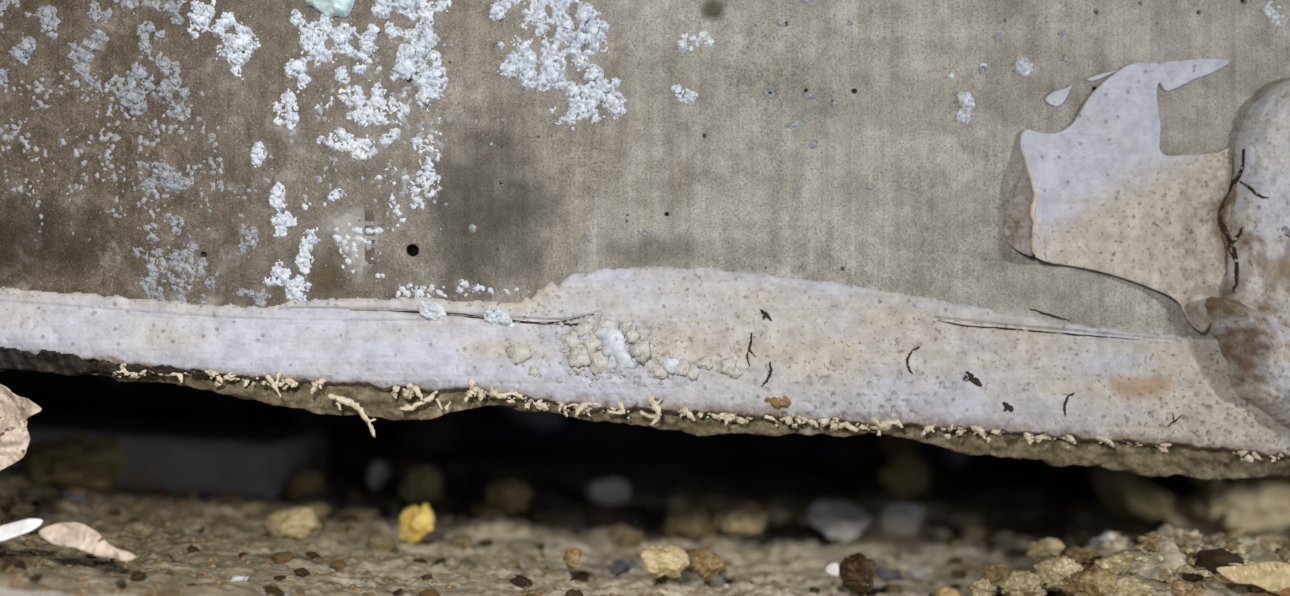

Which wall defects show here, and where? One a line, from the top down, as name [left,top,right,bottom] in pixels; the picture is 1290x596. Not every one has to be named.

efflorescence [0,0,477,307]
efflorescence [489,0,628,131]
peeling [1045,71,1116,107]
crack [1217,149,1269,292]
efflorescence [396,279,530,328]